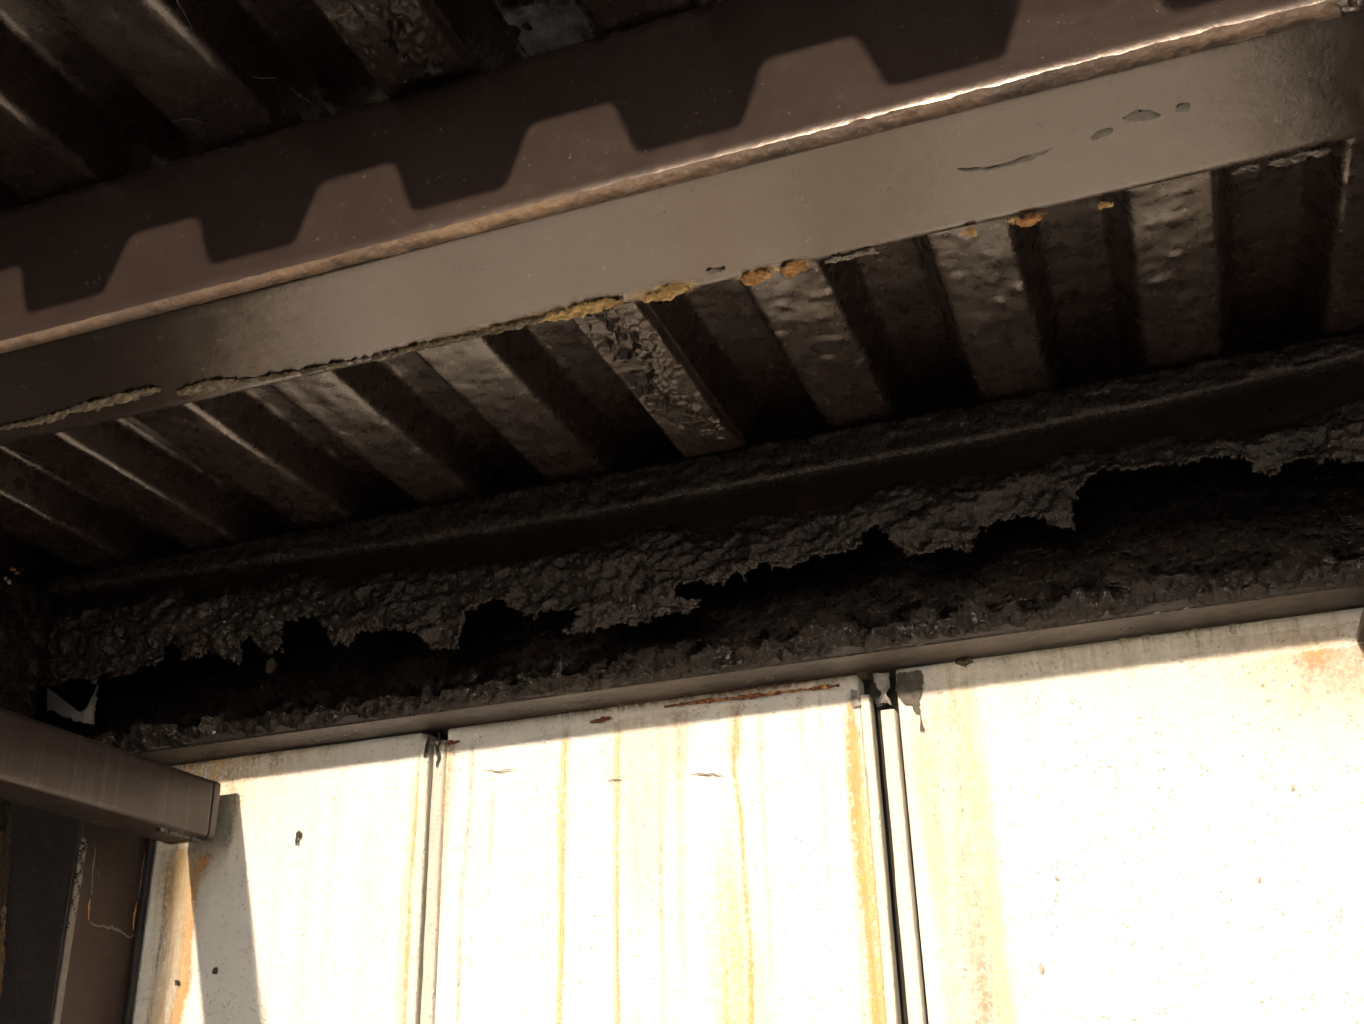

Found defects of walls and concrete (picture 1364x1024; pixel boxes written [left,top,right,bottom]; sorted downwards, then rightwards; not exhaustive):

peeling [371,298,624,362]
peeling [0,378,239,431]
peeling [46,678,99,725]
rust [580,674,847,724]
rust [732,722,744,859]
rust [0,809,13,998]
rust [152,850,210,1024]
rust [847,704,886,1024]
rust [732,939,753,1024]